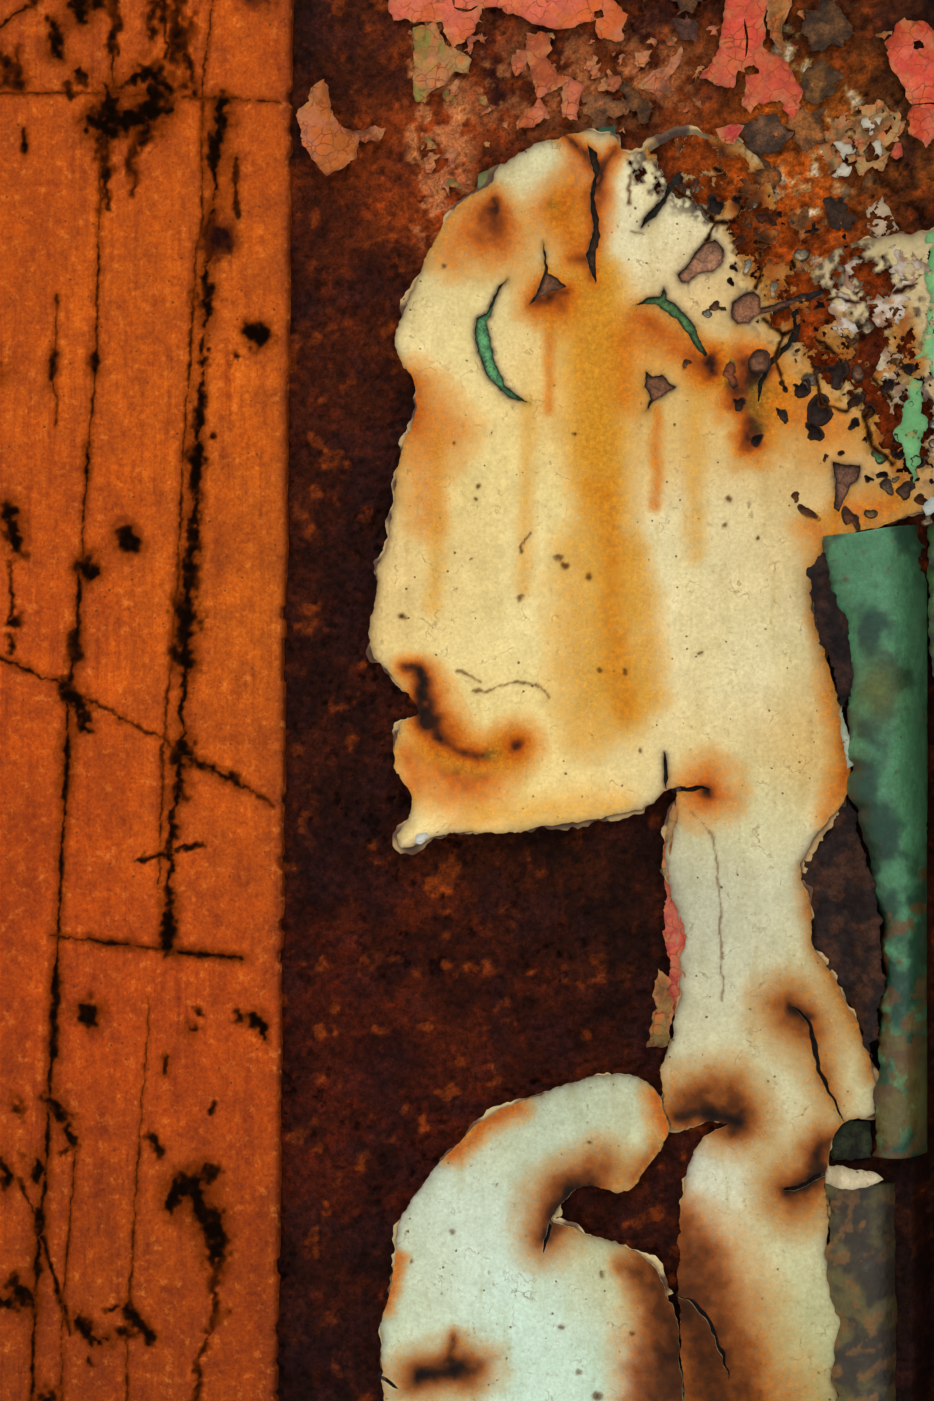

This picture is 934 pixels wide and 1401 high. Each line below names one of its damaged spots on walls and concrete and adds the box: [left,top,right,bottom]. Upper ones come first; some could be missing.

rust [77,51,242,220]
rust [403,366,468,524]
rust [432,133,934,743]
rust [393,655,623,818]
peeling [366,0,934,1401]
rust [678,757,739,817]
rust [521,1062,770,1264]
rust [758,869,873,1232]
crack [790,1006,843,1118]
rust [160,1160,233,1401]
rust [386,1328,496,1401]
rust [612,1199,796,1401]